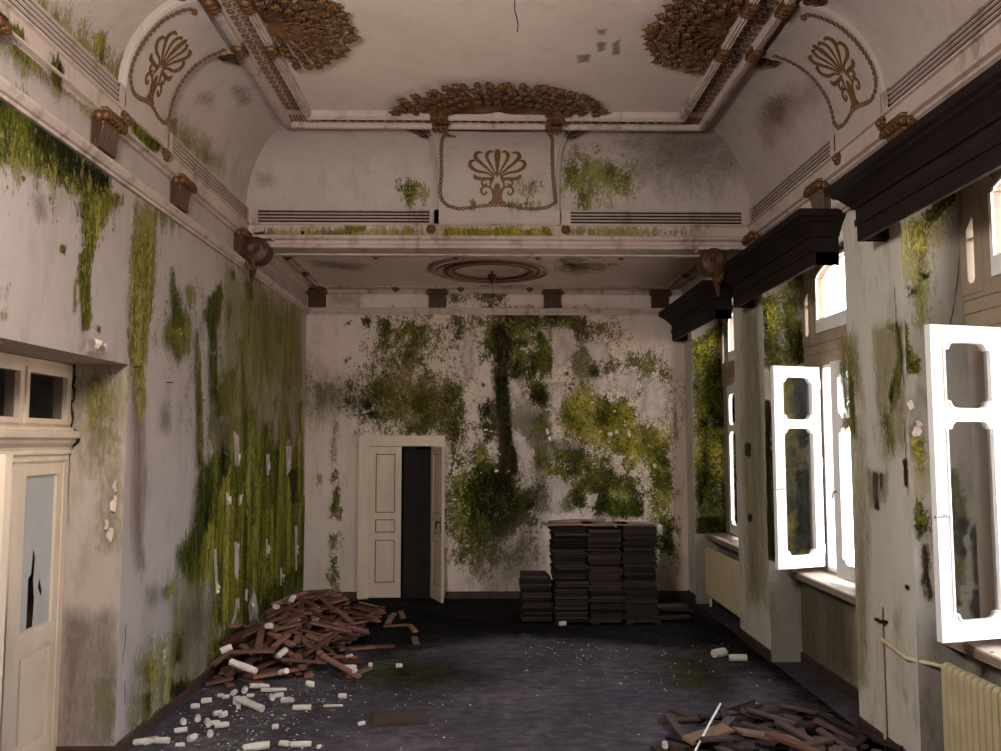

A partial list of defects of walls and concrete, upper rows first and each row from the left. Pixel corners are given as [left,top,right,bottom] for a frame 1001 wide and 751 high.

leakage [305,376,379,421]
leakage [474,323,520,476]
flaking render [233,432,241,466]
peeling [104,480,117,542]
flaking render [213,548,221,595]
flaking render [231,588,259,624]